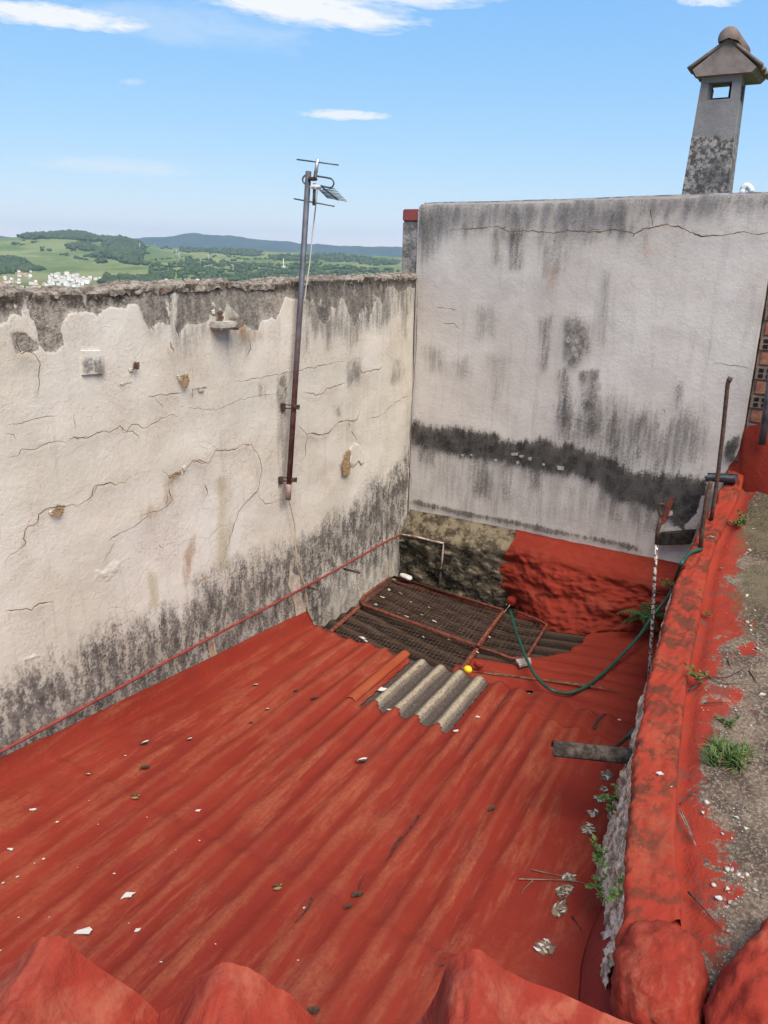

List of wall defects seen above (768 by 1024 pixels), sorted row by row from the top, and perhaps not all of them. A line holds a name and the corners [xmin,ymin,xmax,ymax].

damp [419,194,768,265]
crack [446,209,768,237]
peeling [0,272,417,352]
crack [6,334,380,458]
spalling [342,442,364,476]
crack [298,303,458,484]
damp [411,319,711,528]
damp [724,436,740,462]
crack [4,477,130,564]
crack [103,444,281,569]
crack [5,602,54,613]
damp [0,459,638,758]